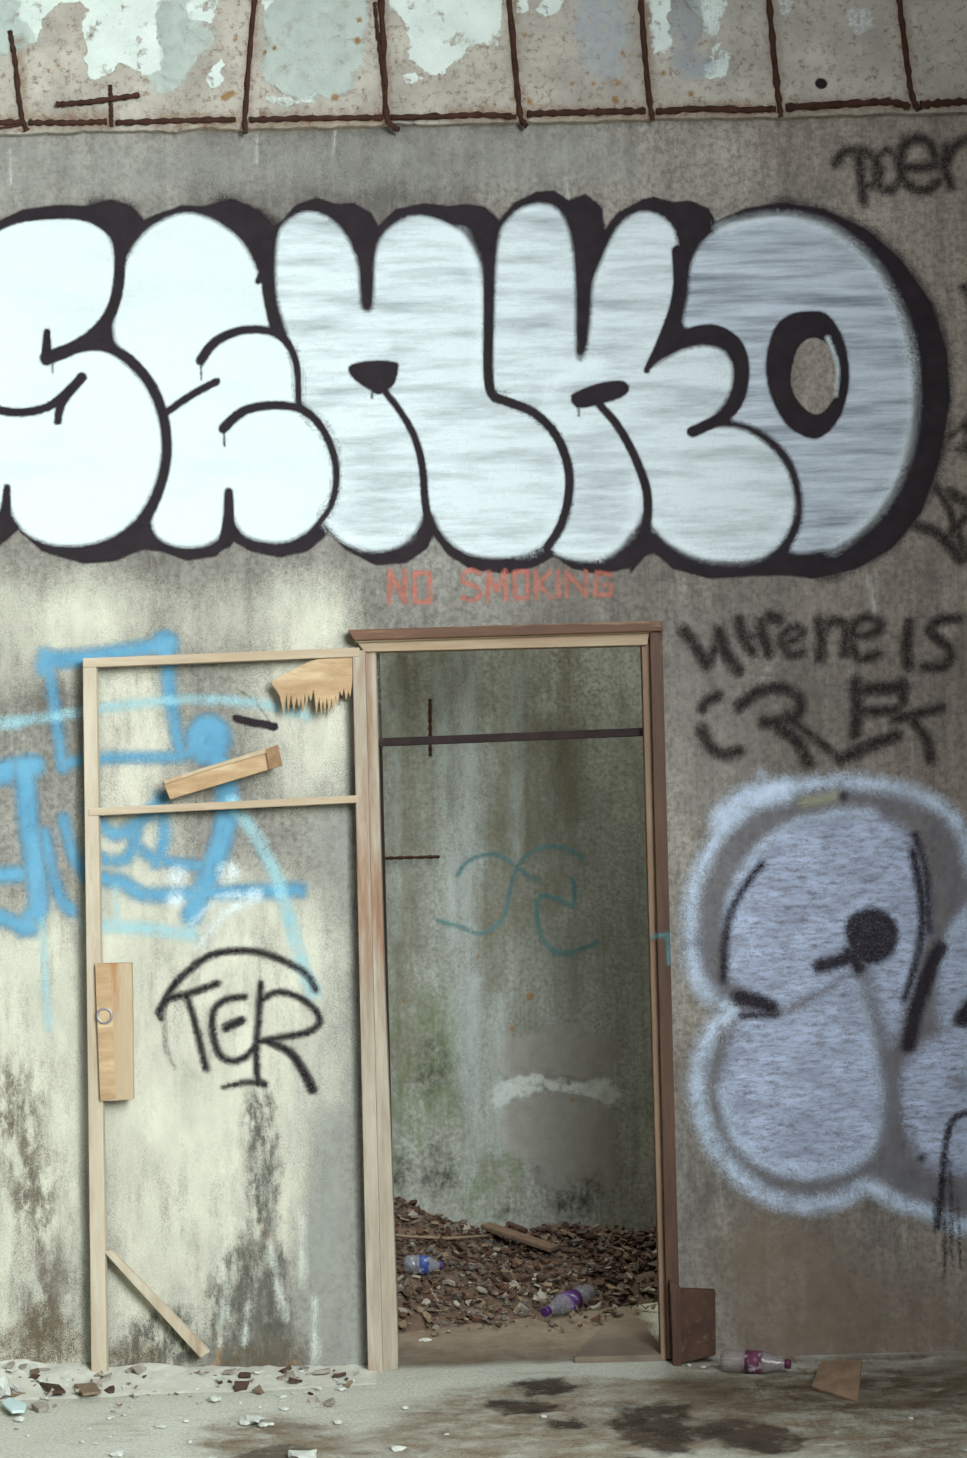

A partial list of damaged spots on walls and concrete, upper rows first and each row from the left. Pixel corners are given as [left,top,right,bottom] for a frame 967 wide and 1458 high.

rust [0,36,119,136]
rust [153,0,395,134]
spalling [0,0,967,134]
rust [440,0,967,128]
damp [109,690,368,1367]
damp [0,983,91,1364]
damp [174,1305,967,1458]